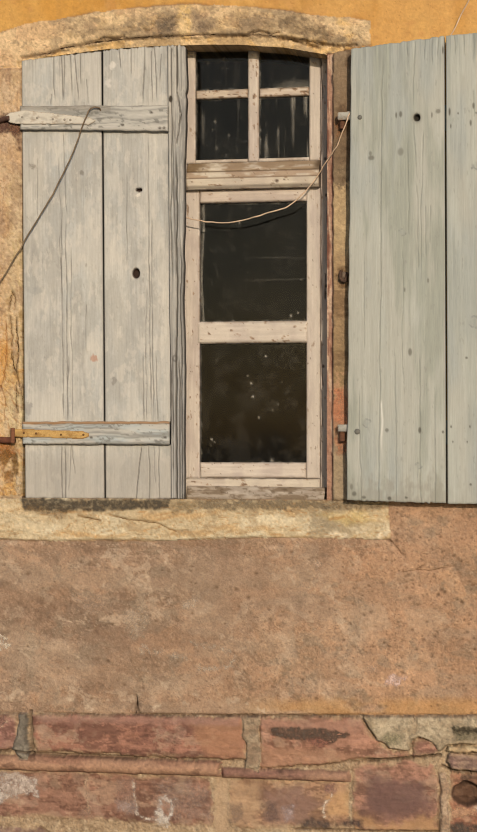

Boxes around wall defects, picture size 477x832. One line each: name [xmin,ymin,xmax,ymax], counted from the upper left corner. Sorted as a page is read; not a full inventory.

flaking render [0,444,477,728]
spalling [271,727,350,748]
leakage [0,772,39,803]